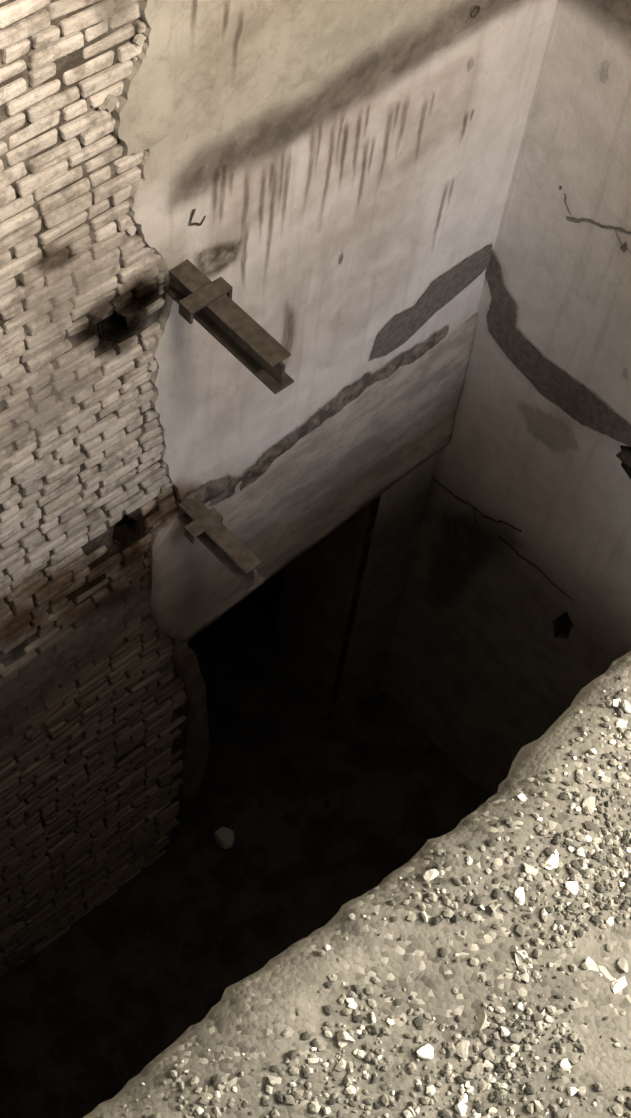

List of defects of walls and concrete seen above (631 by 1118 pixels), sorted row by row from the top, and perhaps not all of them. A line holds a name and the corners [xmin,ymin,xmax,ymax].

crack [564,193,631,252]
spalling [616,445,631,479]
flaking render [0,0,490,1118]